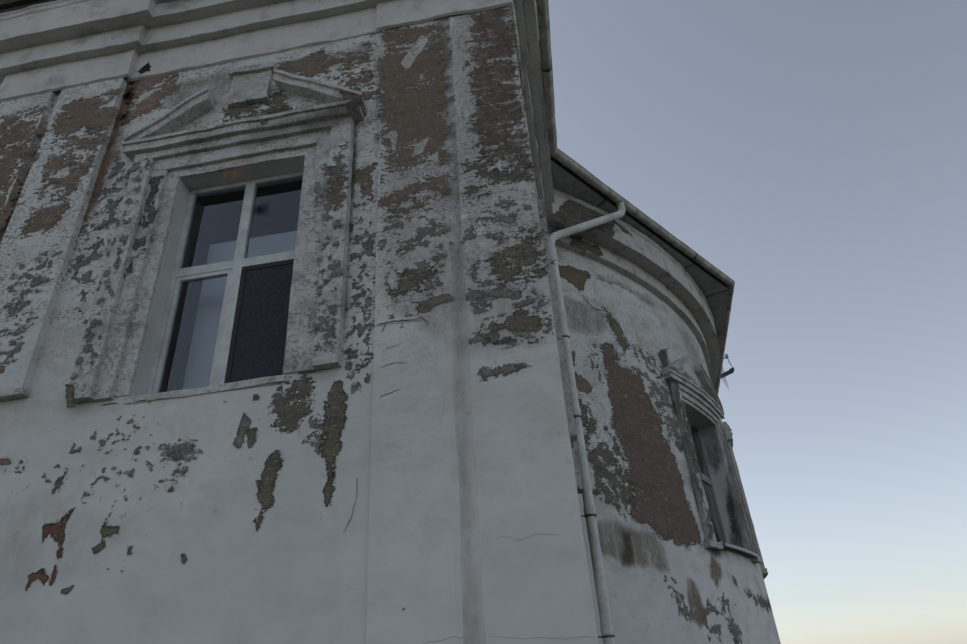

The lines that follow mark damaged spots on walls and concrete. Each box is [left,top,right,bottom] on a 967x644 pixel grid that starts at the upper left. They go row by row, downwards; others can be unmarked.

peeling [0,73,188,239]
peeling [0,156,166,408]
peeling [253,6,632,519]
peeling [0,456,28,473]
peeling [25,415,203,595]
peeling [233,412,257,449]
peeling [252,450,284,531]
spalling [571,307,722,550]
peeling [664,575,742,644]
peeling [744,586,772,614]